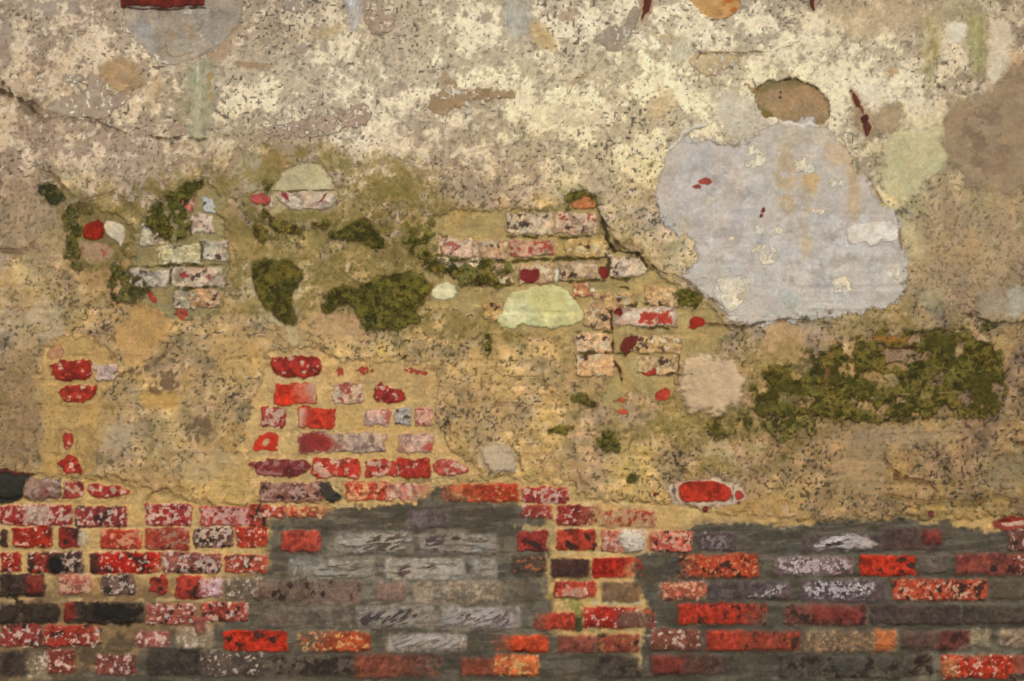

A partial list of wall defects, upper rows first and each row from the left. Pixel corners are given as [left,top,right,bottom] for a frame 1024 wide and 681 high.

crack [0,78,40,115]
spalling [66,177,230,321]
peeling [417,77,909,414]
crack [597,209,832,329]
spalling [41,335,119,407]
spalling [243,345,481,509]
spalling [23,428,137,502]
spalling [653,476,748,512]
spalling [993,516,1024,530]